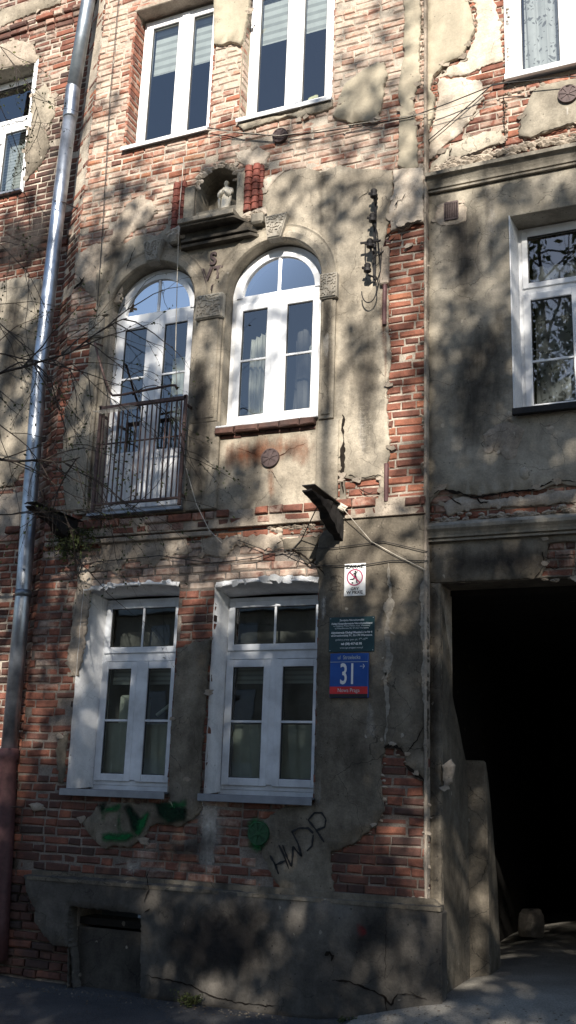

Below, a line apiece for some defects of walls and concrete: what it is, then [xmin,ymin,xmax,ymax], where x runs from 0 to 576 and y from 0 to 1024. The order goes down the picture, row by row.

flaking render [22,84,59,182]
flaking render [239,0,576,172]
spalling [336,240,576,523]
crack [338,415,381,494]
spalling [330,741,456,898]
crack [145,975,277,1007]
crack [325,912,427,1010]